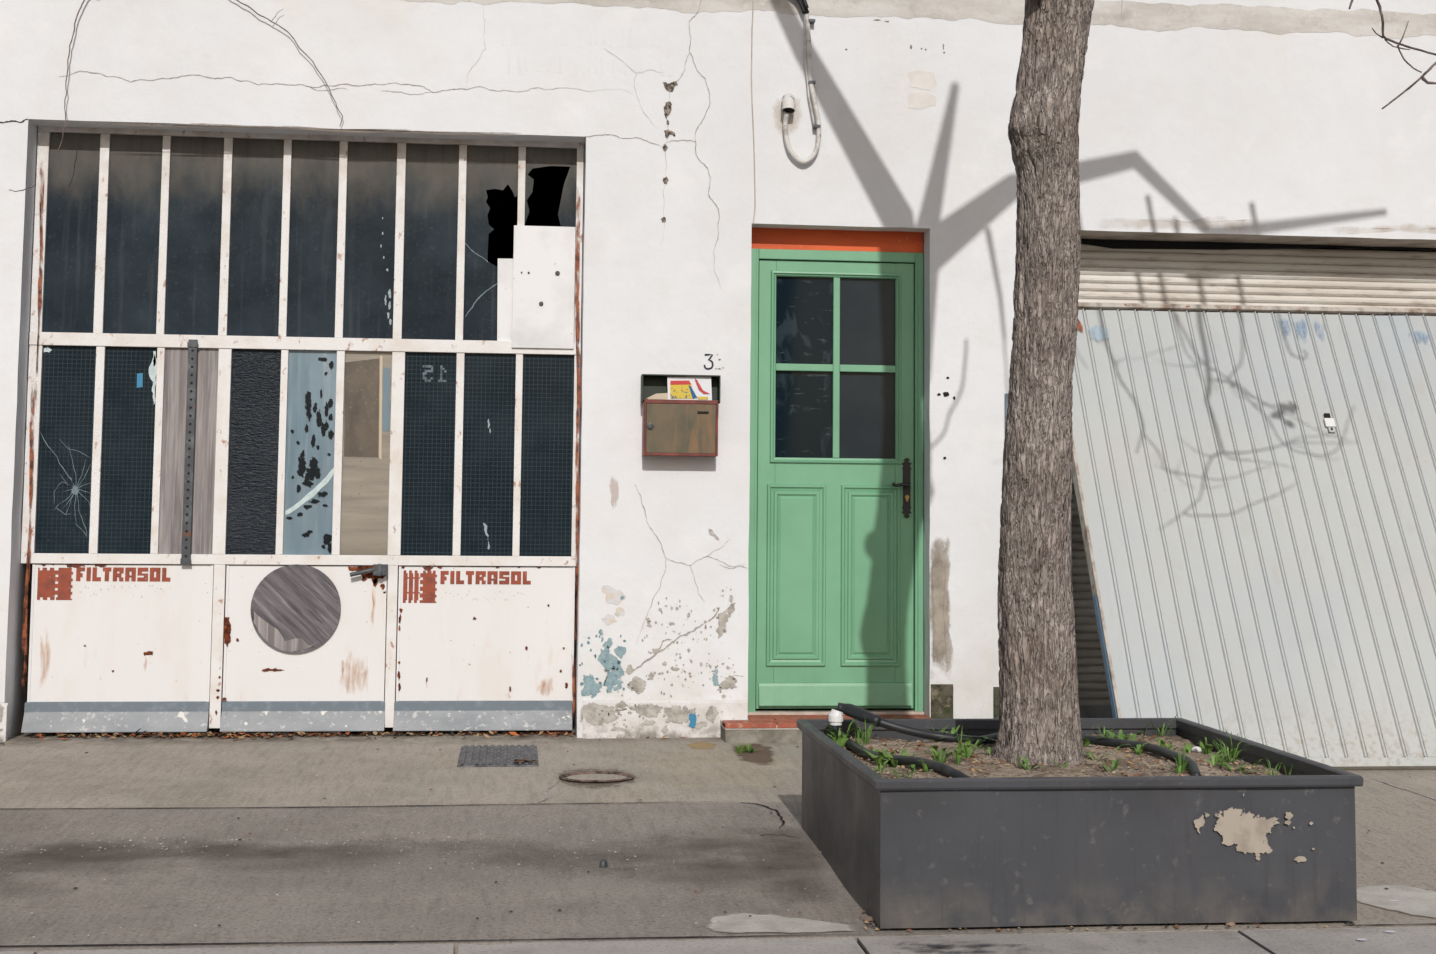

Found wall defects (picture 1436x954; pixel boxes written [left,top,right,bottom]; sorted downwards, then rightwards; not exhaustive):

crack [59,0,720,280]
peeling [579,585,737,734]
crack [635,485,746,669]